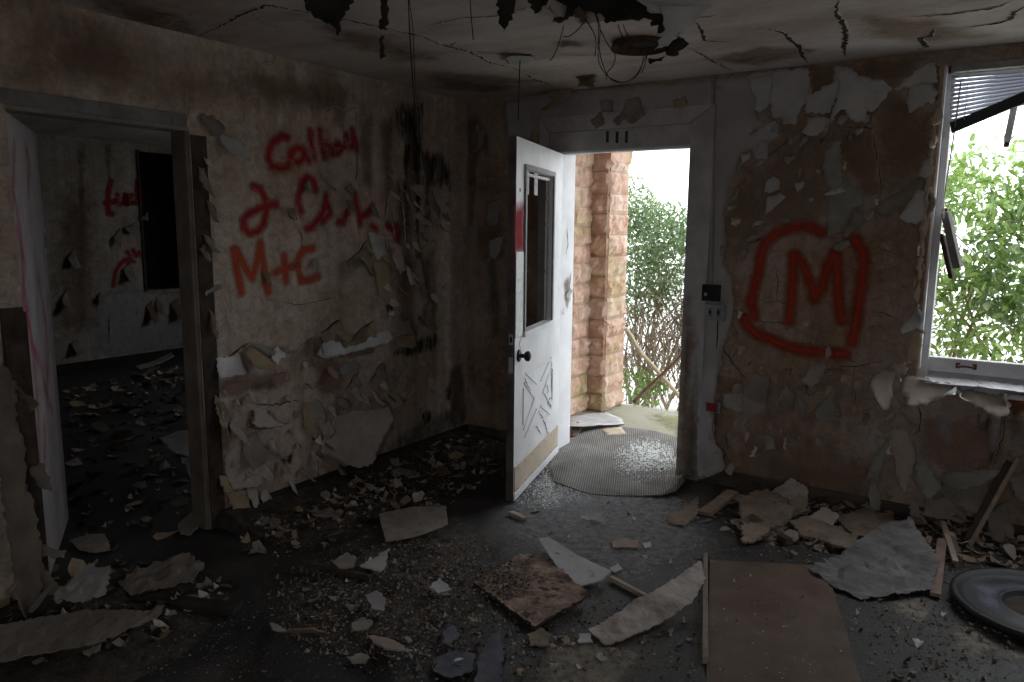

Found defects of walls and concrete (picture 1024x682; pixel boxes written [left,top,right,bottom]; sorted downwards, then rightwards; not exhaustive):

crack [688,15,733,71]
crack [757,28,808,62]
crack [832,0,850,56]
crack [910,0,1024,49]
peeling [305,152,452,316]
leakage [361,102,450,319]
peeling [97,291,183,356]
peeling [302,319,393,392]
peeling [504,62,1024,569]
peeling [214,341,406,528]